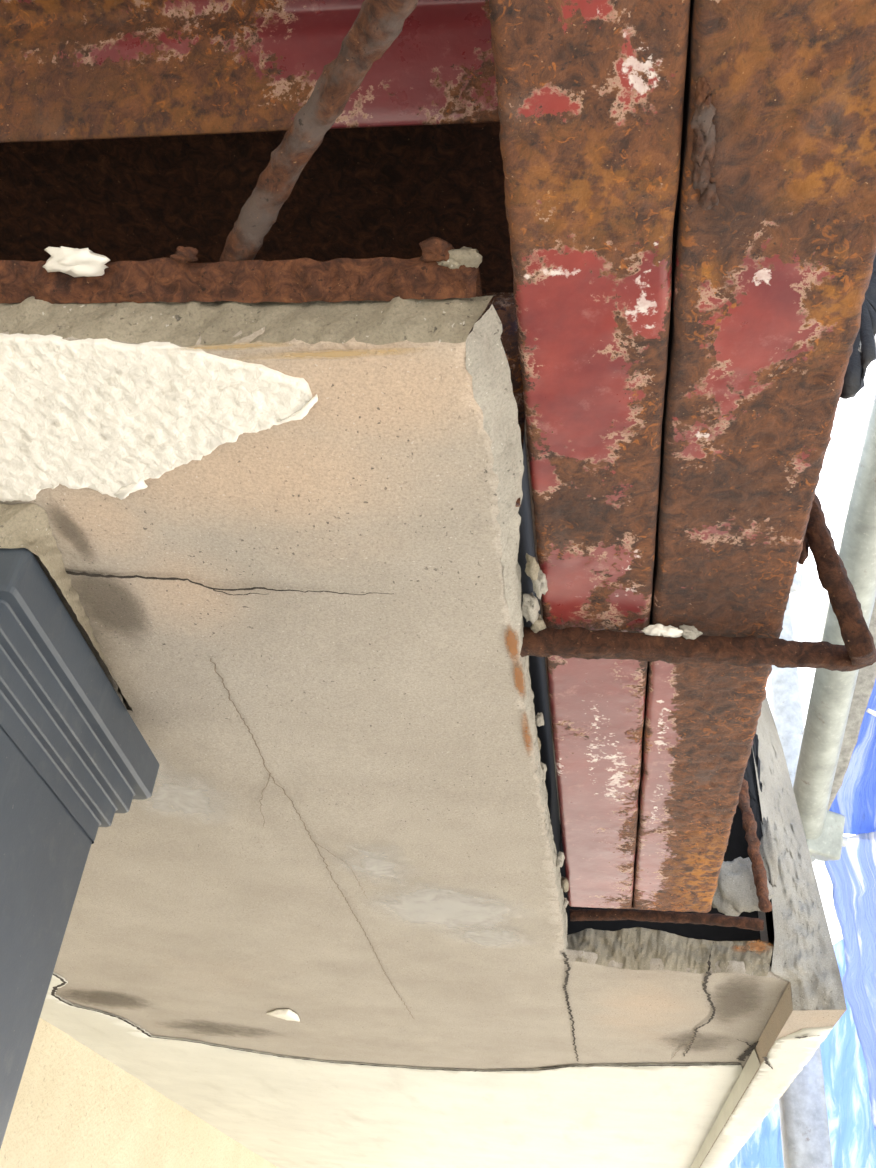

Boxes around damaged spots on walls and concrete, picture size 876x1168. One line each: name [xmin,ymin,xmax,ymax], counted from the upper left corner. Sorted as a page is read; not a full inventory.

crack [66,571,394,595]
peeling [0,296,773,976]
rust [506,629,525,694]
rust [798,535,809,565]
rust [523,715,532,750]
crack [210,658,413,1017]
water stain [72,994,137,1006]
crack [562,952,579,1061]
crack [670,942,716,1060]
peeling [40,972,833,1168]